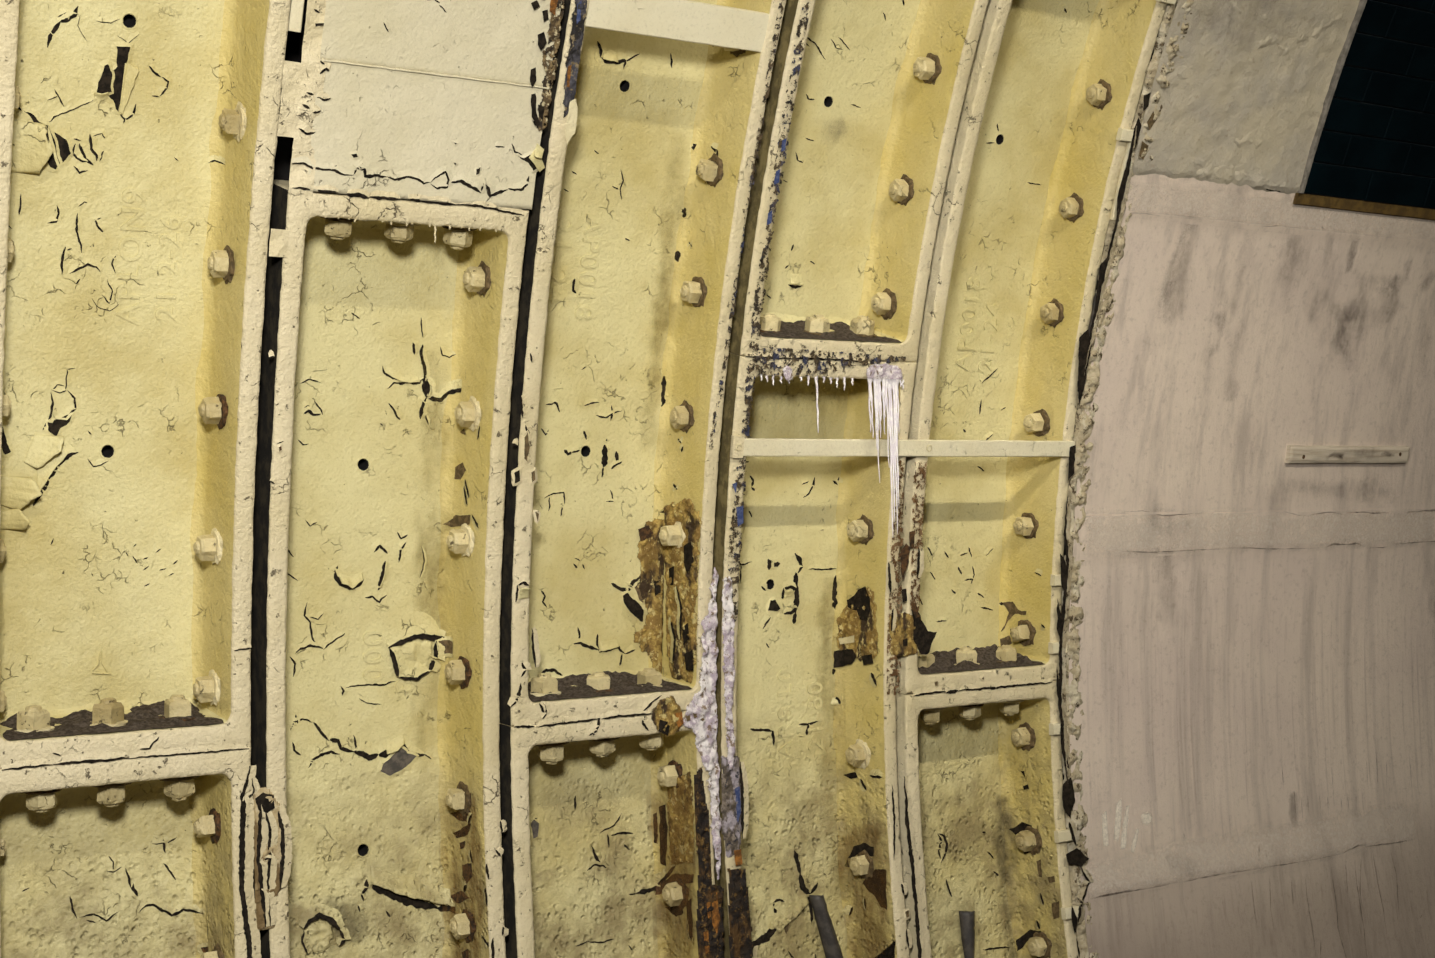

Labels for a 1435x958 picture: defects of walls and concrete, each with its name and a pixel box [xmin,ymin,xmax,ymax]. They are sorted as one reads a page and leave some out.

peeling [11,41,141,174]
rust [530,0,587,144]
peeling [9,194,27,229]
crack [291,147,627,215]
peeling [0,364,82,530]
crack [298,374,326,445]
crack [380,317,462,426]
damp [755,345,906,382]
rust [634,482,702,738]
rust [832,531,937,688]
damp [683,567,735,880]
rust [652,756,754,958]